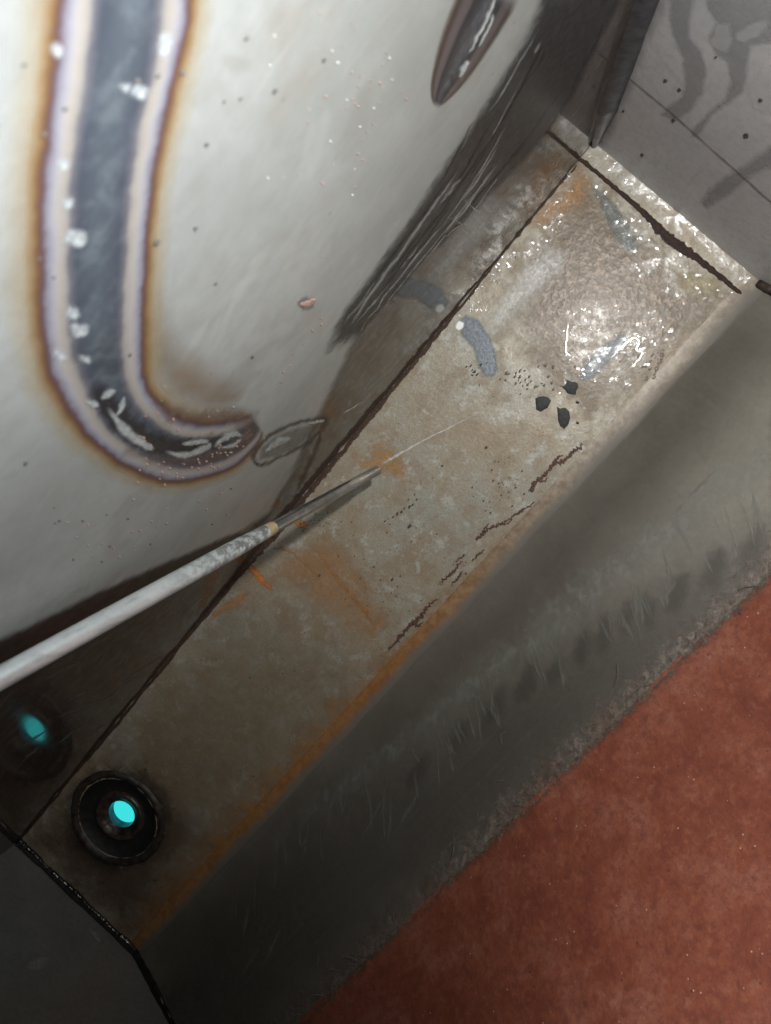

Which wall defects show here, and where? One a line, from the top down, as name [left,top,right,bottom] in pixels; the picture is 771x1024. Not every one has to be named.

leakage [0,540,266,855]
leakage [0,0,635,664]
crack [19,158,742,840]